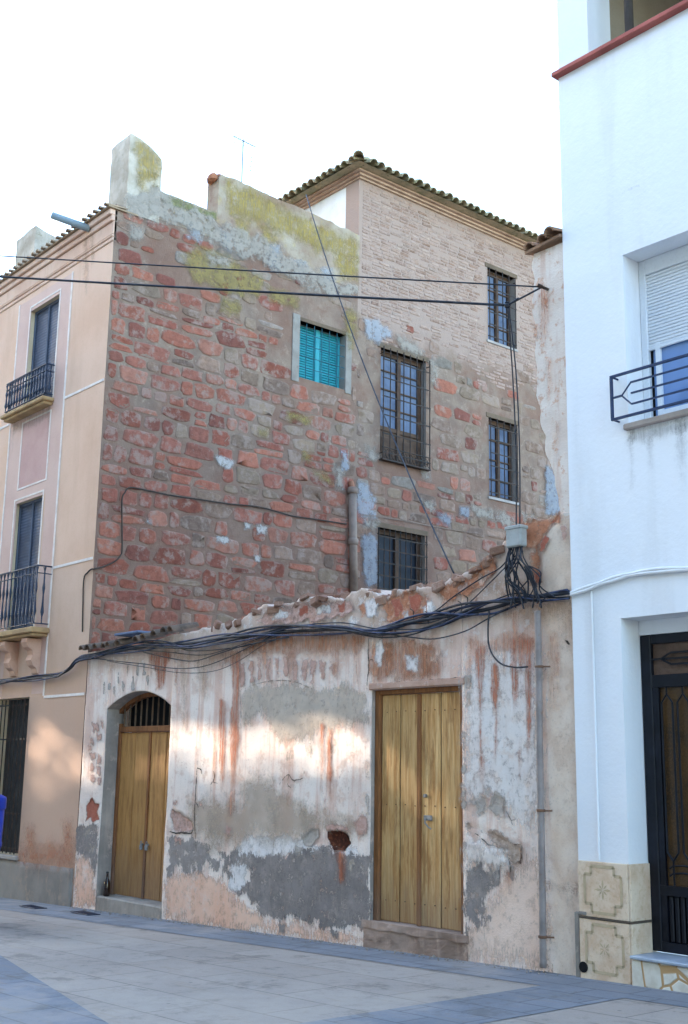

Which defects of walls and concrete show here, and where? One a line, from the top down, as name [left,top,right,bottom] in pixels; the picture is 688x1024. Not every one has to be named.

spalling [257,558,496,632]
peeling [73,857,97,908]
peeling [164,795,369,945]
peeling [458,647,553,971]